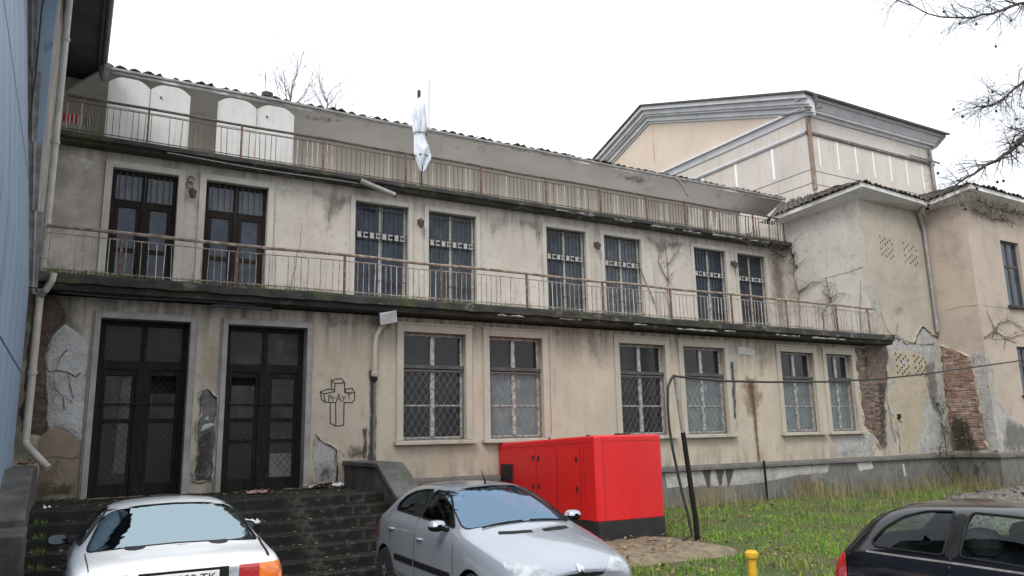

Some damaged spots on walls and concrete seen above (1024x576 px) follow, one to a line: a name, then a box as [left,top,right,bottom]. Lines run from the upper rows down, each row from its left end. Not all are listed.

peeling [190,388,219,484]
peeling [312,434,339,484]
peeling [665,326,1024,488]
damp [952,417,977,451]